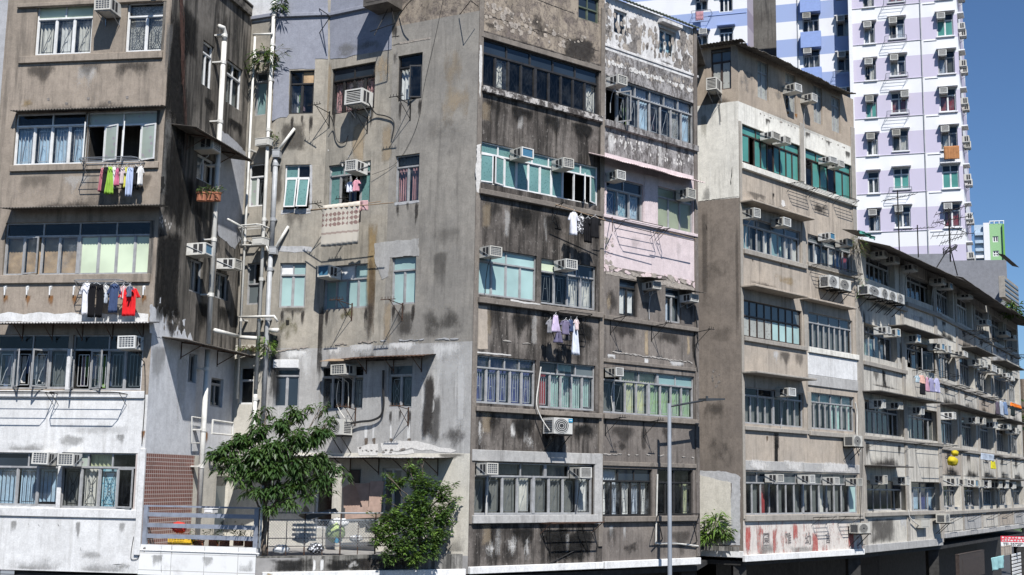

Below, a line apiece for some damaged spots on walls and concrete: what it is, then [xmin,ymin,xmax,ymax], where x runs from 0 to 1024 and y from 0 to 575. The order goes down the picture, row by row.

damp [565,39,594,62]
peeling [604,1,693,95]
damp [514,107,560,132]
damp [513,314,553,334]
damp [578,323,592,347]
damp [615,327,695,365]
damp [430,342,464,419]
damp [389,375,458,441]
damp [511,419,532,443]
damp [574,425,593,438]
damp [613,427,646,449]
damp [509,528,592,560]